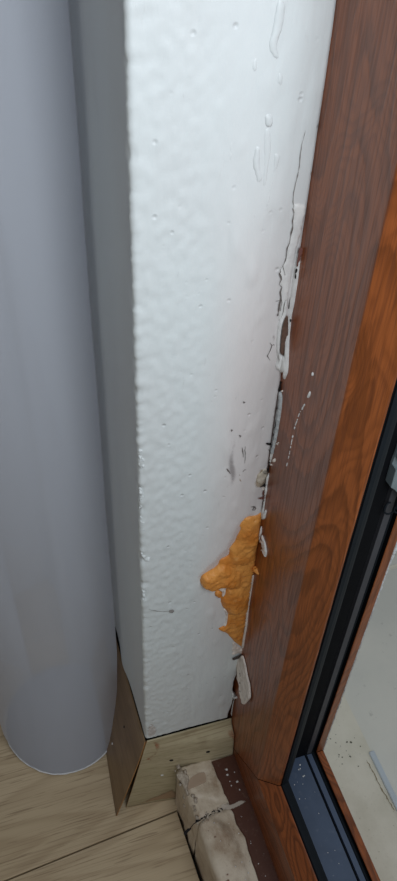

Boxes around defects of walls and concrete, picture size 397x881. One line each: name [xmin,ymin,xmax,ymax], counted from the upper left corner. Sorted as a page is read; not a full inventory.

crack [277,134,305,316]
crack [184,801,244,835]